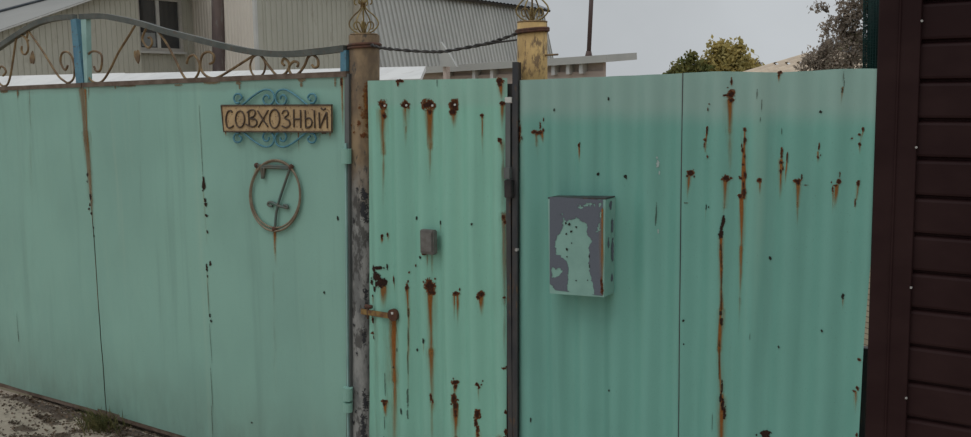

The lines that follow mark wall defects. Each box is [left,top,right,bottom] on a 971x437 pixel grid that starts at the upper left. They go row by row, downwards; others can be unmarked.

corrosion [351,82,387,167]
corrosion [400,98,436,147]
corrosion [448,98,459,122]
corrosion [723,77,735,129]
corrosion [779,147,806,205]
corrosion [721,127,762,284]
corrosion [423,277,436,404]
corrosion [381,321,397,421]
corrosion [450,378,460,433]
corrosion [473,409,481,437]